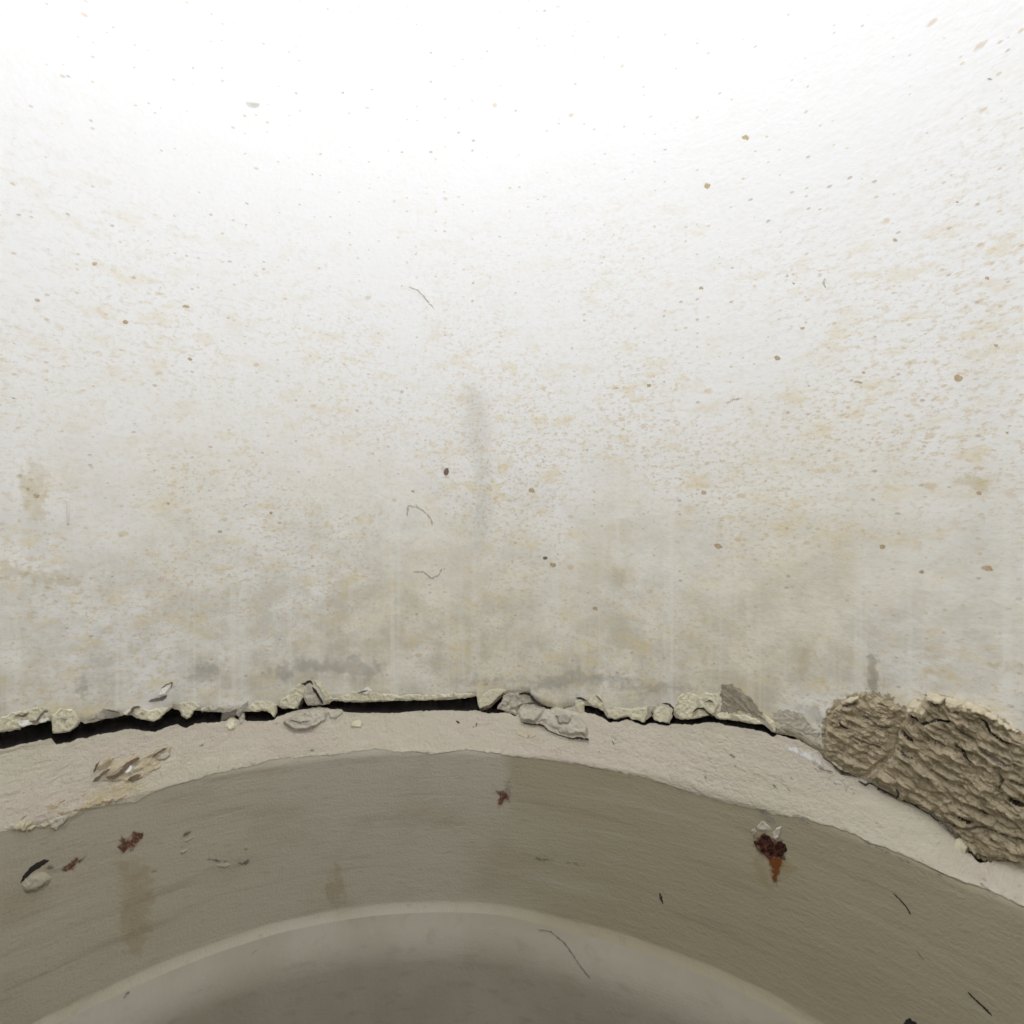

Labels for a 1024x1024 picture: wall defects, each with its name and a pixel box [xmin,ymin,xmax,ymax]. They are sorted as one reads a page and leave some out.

peeling [0,680,506,733]
peeling [517,703,544,723]
spalling [12,746,172,834]
crack [0,680,961,839]
spalling [575,684,1024,865]
corrosion [118,831,143,853]
corrosion [754,833,787,882]